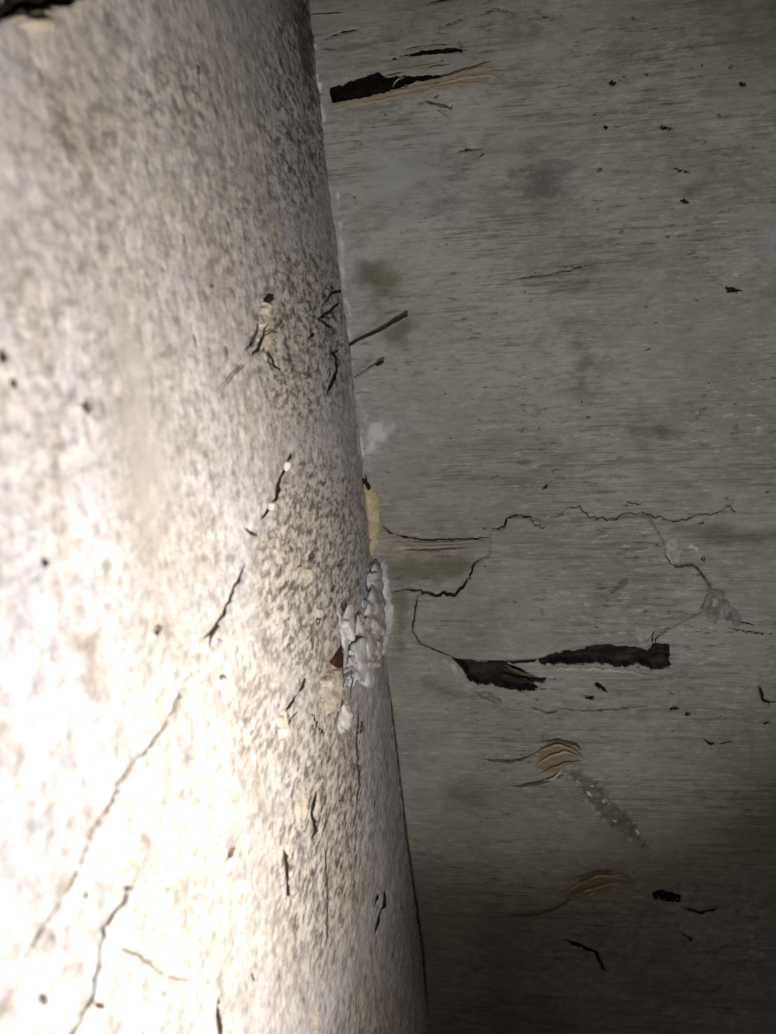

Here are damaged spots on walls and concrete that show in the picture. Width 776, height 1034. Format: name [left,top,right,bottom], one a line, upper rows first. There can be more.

crack [384,501,736,655]
leakage [337,560,464,735]
crack [482,657,537,665]
spalling [440,626,671,705]
crack [734,622,764,635]
peeling [483,740,582,788]
crack [76,884,193,1034]